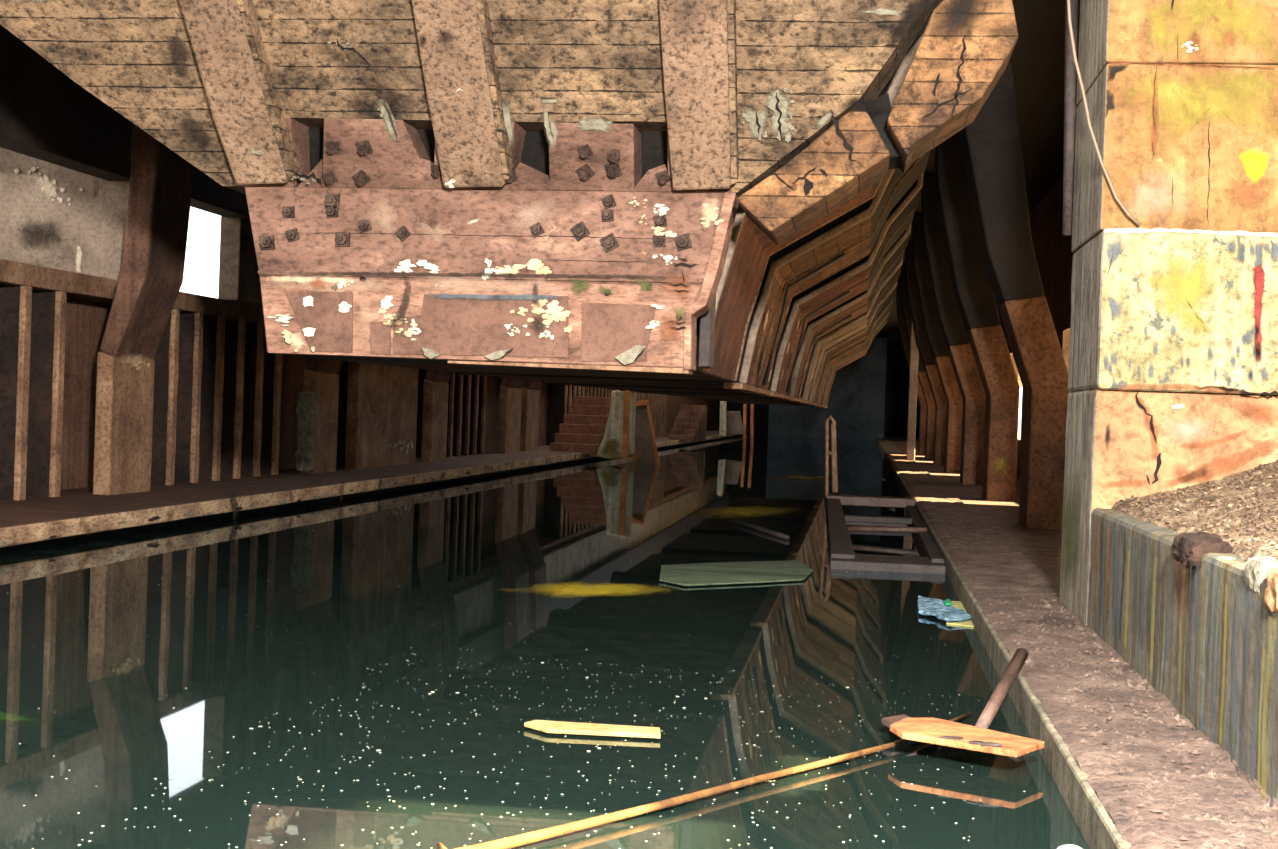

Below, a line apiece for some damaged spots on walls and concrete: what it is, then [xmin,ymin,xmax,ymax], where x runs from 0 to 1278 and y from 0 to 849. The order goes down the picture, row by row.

crack [923,35,973,118]
peeling [629,197,677,237]
peeling [700,200,724,227]
peeling [394,259,440,273]
peeling [482,258,552,280]
spalling [267,314,316,352]
peeling [273,276,354,313]
peeling [378,295,440,359]
peeling [484,299,573,360]
rust [1253,265,1265,359]
crack [1136,391,1162,484]